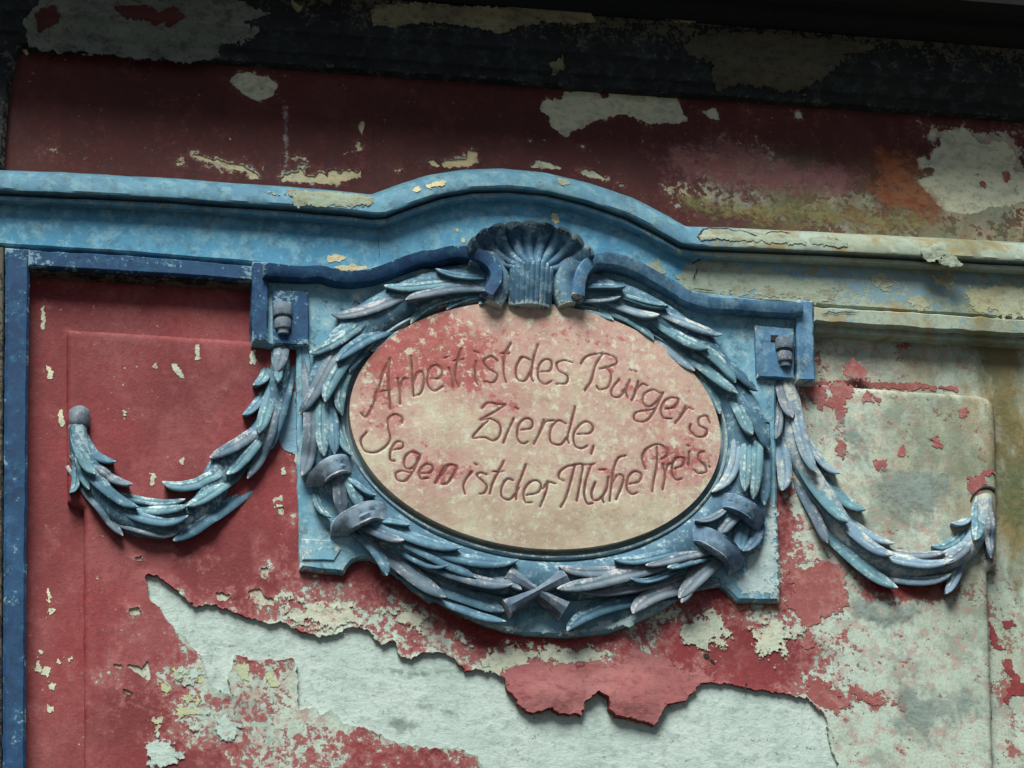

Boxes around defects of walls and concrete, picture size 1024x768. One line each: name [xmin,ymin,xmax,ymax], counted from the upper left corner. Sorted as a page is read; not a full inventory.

peeling [22,0,270,64]
peeling [370,1,596,34]
peeling [231,72,278,101]
peeling [539,91,688,137]
peeling [176,154,260,179]
spalling [267,154,374,209]
peeling [916,127,1024,214]
peeling [697,228,848,248]
peeling [803,380,881,424]
peeling [872,445,908,472]
spalling [113,567,908,768]
peeling [1002,659,1024,704]